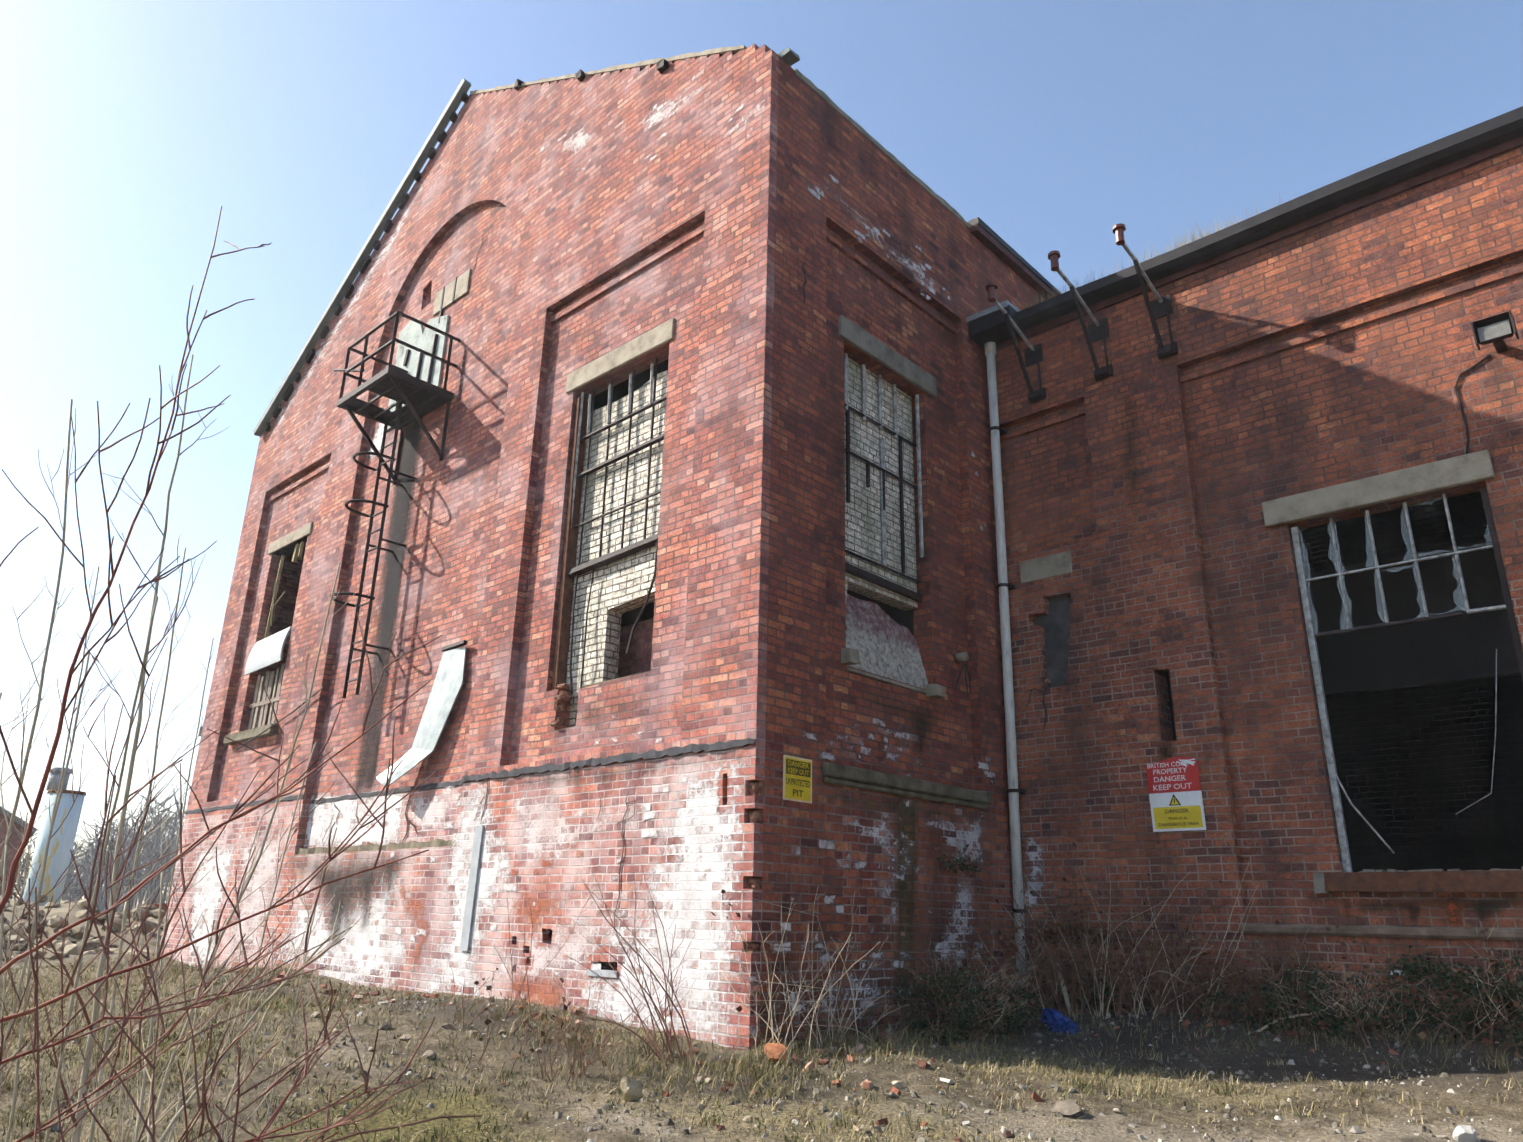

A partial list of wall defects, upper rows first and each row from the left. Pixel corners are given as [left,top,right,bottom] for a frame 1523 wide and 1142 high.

water stain [301,862,392,931]
water stain [843,799,916,1001]